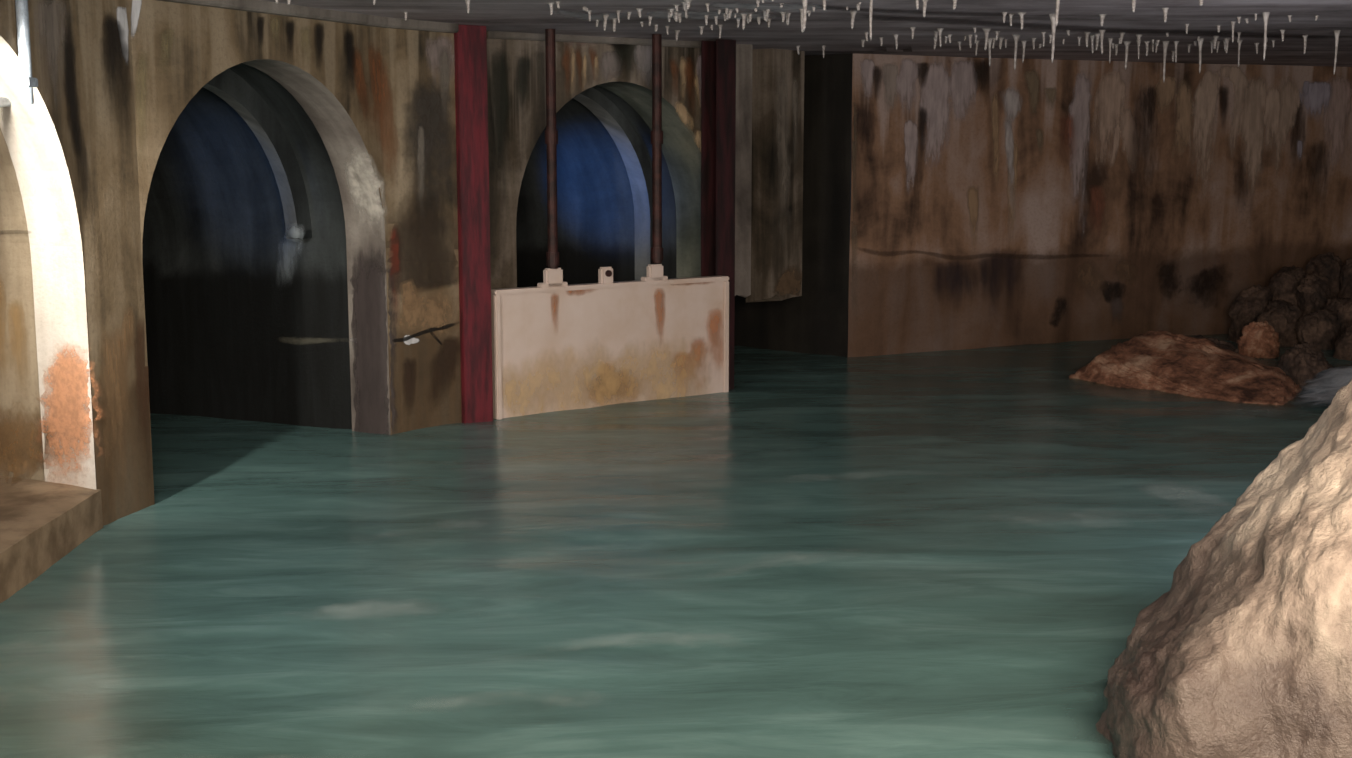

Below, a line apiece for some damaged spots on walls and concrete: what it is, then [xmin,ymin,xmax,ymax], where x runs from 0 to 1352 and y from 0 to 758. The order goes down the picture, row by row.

leakage [861,49,987,182]
leakage [1005,71,1056,180]
leakage [1069,66,1352,196]
rust [553,290,585,316]
rust [655,291,664,326]
rust [677,314,720,373]
leakage [0,414,50,477]